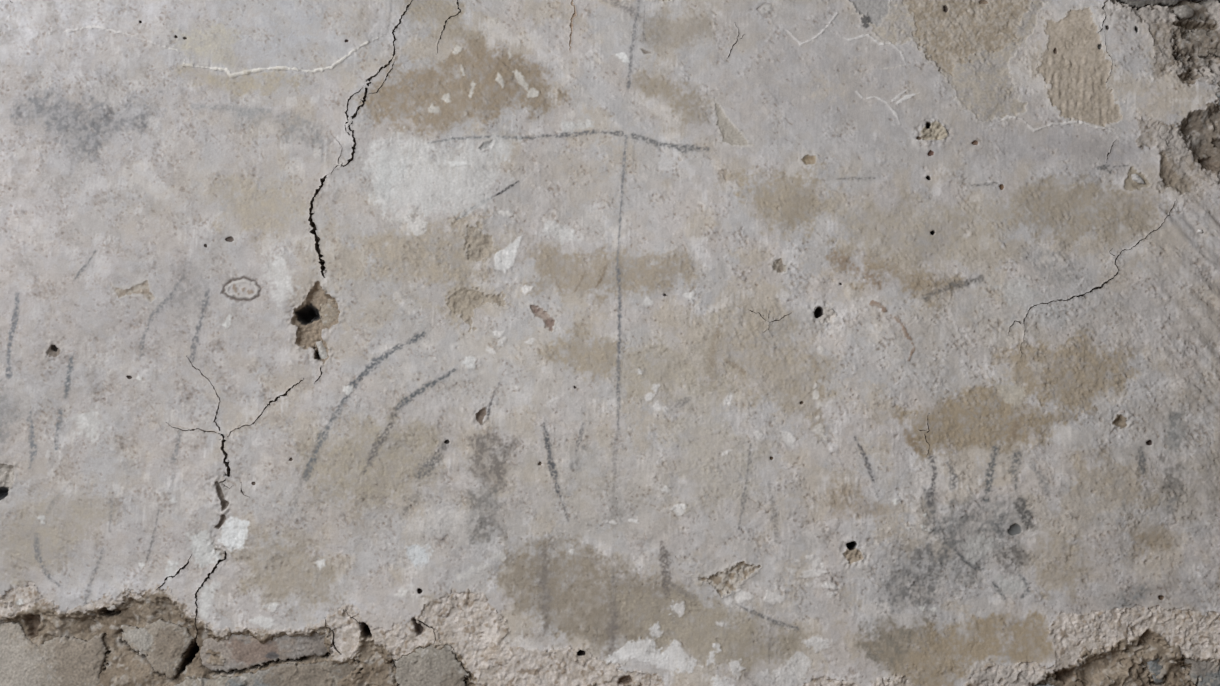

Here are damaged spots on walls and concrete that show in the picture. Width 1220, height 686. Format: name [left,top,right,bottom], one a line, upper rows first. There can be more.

crack [435,0,462,54]
crack [307,0,415,278]
flaking render [849,0,1220,198]
spalling [291,281,340,363]
crack [1006,199,1178,358]
crack [166,356,324,499]
spalling [0,463,15,500]
spalling [214,481,229,529]
crack [155,551,229,640]
spalling [0,548,856,686]
spalling [965,605,1220,686]